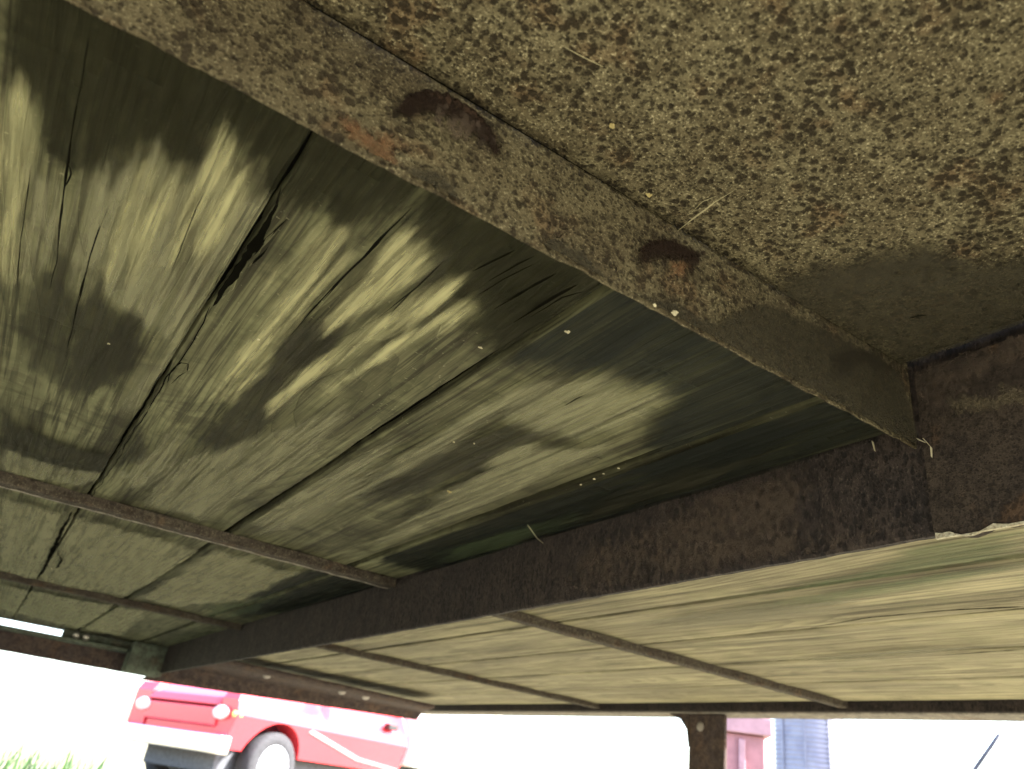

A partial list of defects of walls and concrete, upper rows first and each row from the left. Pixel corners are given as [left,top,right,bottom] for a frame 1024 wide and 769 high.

crack [50,34,90,287]
crack [65,208,108,358]
crack [38,512,72,579]